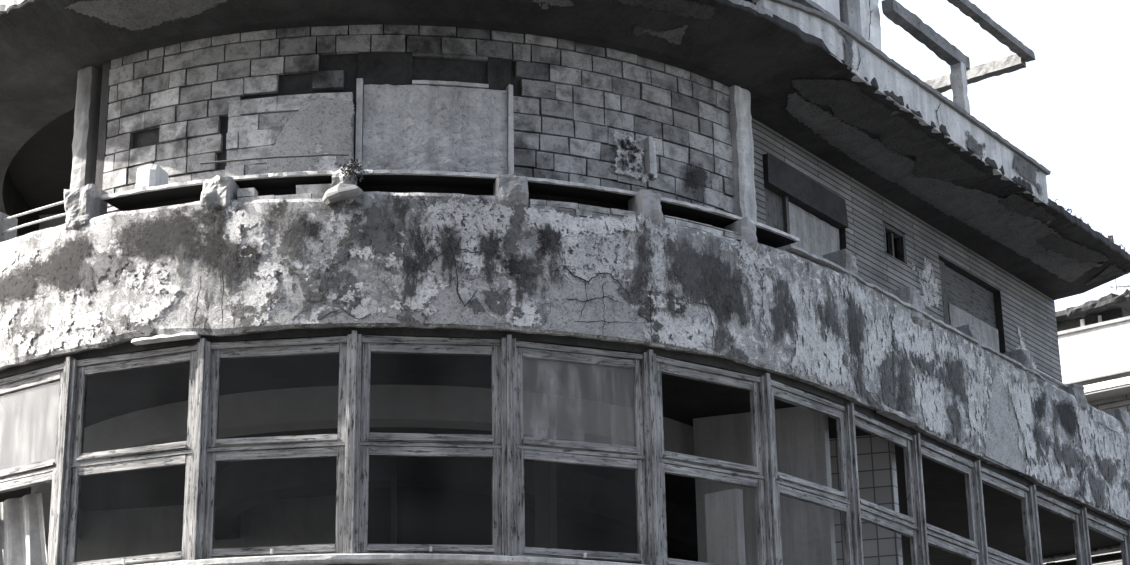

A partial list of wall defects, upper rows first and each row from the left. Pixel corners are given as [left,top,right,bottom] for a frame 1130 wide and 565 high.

flaking render [785,30,1130,286]
leakage [0,230,96,303]
peeling [0,225,201,356]
leakage [114,200,323,297]
leakage [392,194,465,304]
flaking render [222,196,749,361]
leakage [477,223,564,305]
crack [551,265,714,346]
leakage [630,222,798,345]
leakage [815,293,868,391]
flaking render [735,237,1130,521]
leakage [1031,392,1078,446]